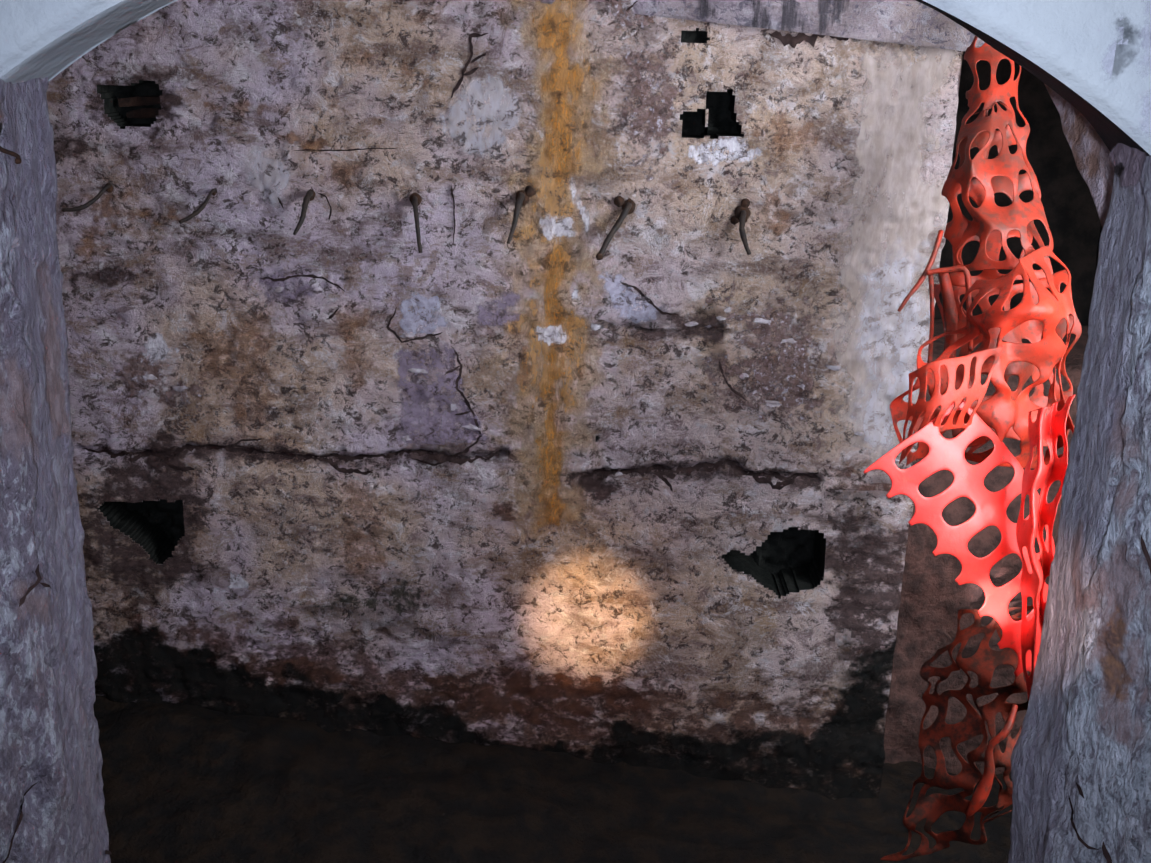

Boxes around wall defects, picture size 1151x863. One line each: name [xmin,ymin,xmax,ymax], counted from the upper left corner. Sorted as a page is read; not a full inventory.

hole [97,80,163,129]
corrosion [506,0,596,528]
peeling [599,28,956,463]
crack [584,457,821,491]
hole [97,499,185,564]
hole [722,527,826,599]